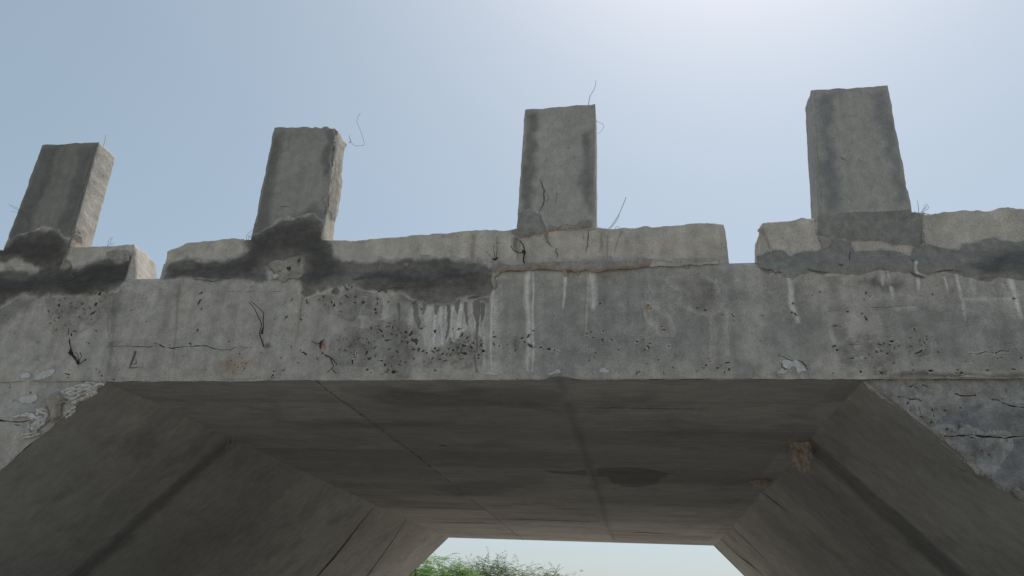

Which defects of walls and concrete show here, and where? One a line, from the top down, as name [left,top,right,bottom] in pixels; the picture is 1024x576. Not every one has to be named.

spalling [268,255,305,283]
crack [110,342,251,369]
water stain [264,228,1024,505]
peeling [777,359,807,377]
crack [956,393,1024,410]
crack [944,432,1024,441]